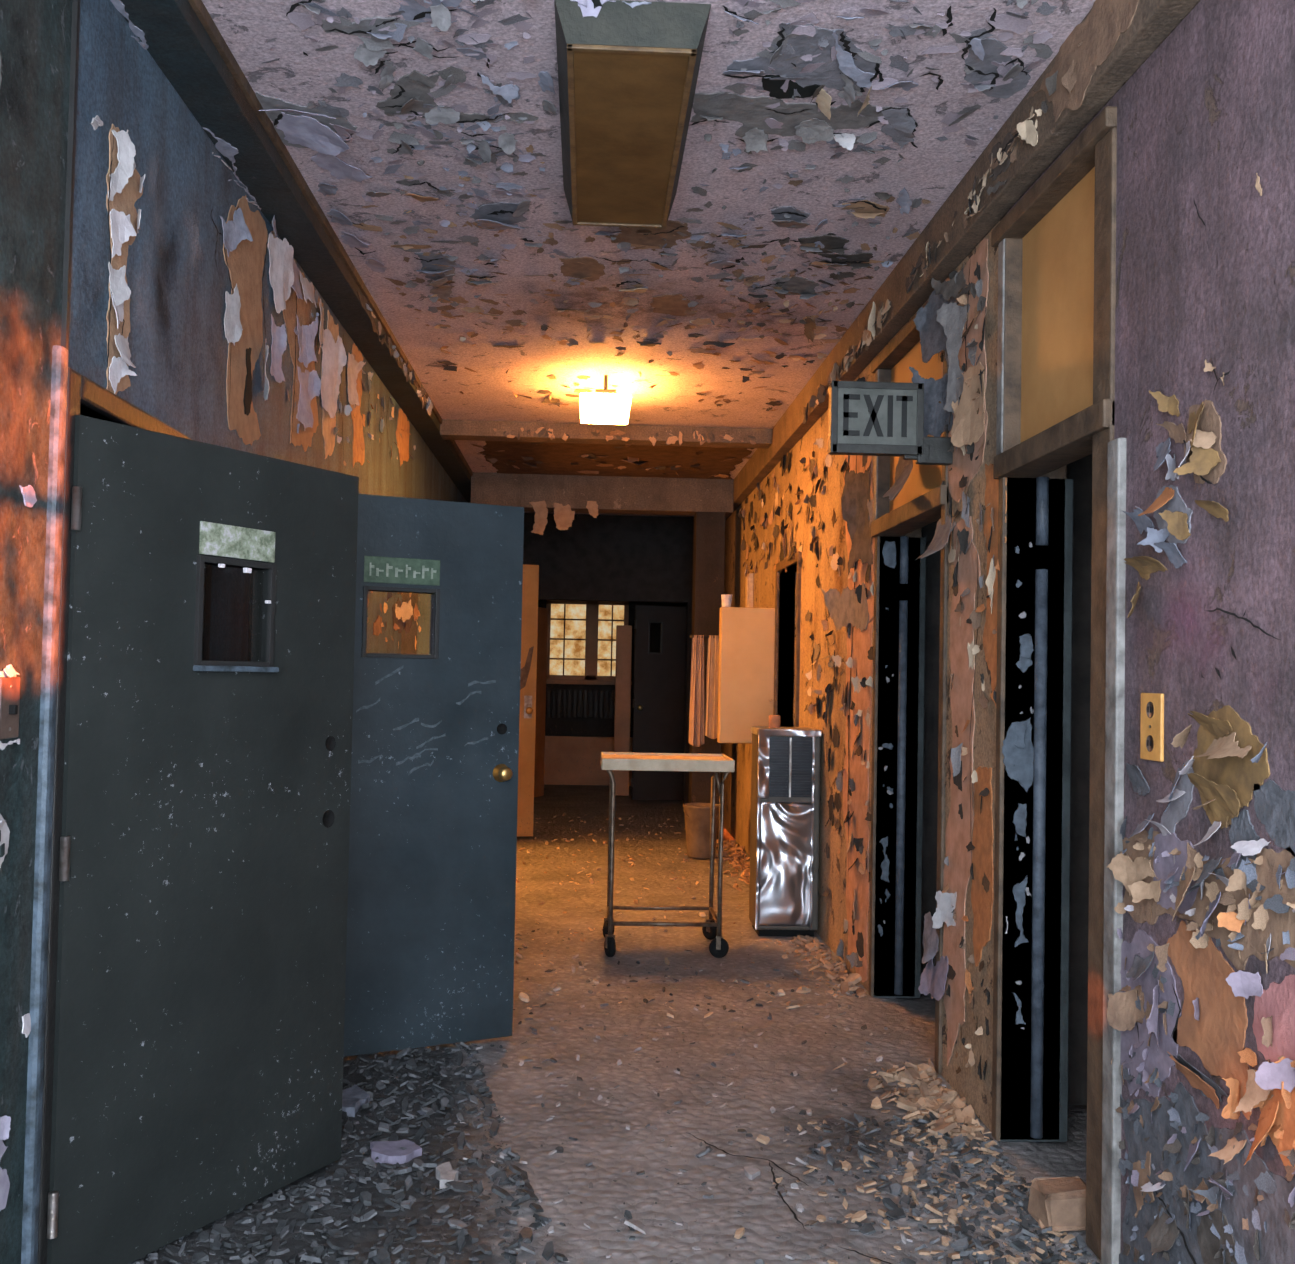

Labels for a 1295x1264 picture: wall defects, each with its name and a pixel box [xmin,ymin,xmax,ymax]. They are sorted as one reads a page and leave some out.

peeling [90,115,145,395]
peeling [203,127,416,468]
peeling [256,0,1139,1080]
peeling [1122,390,1229,618]
peeling [0,814,10,867]
peeling [22,1013,31,1038]
flaking render [1107,705,1295,1264]